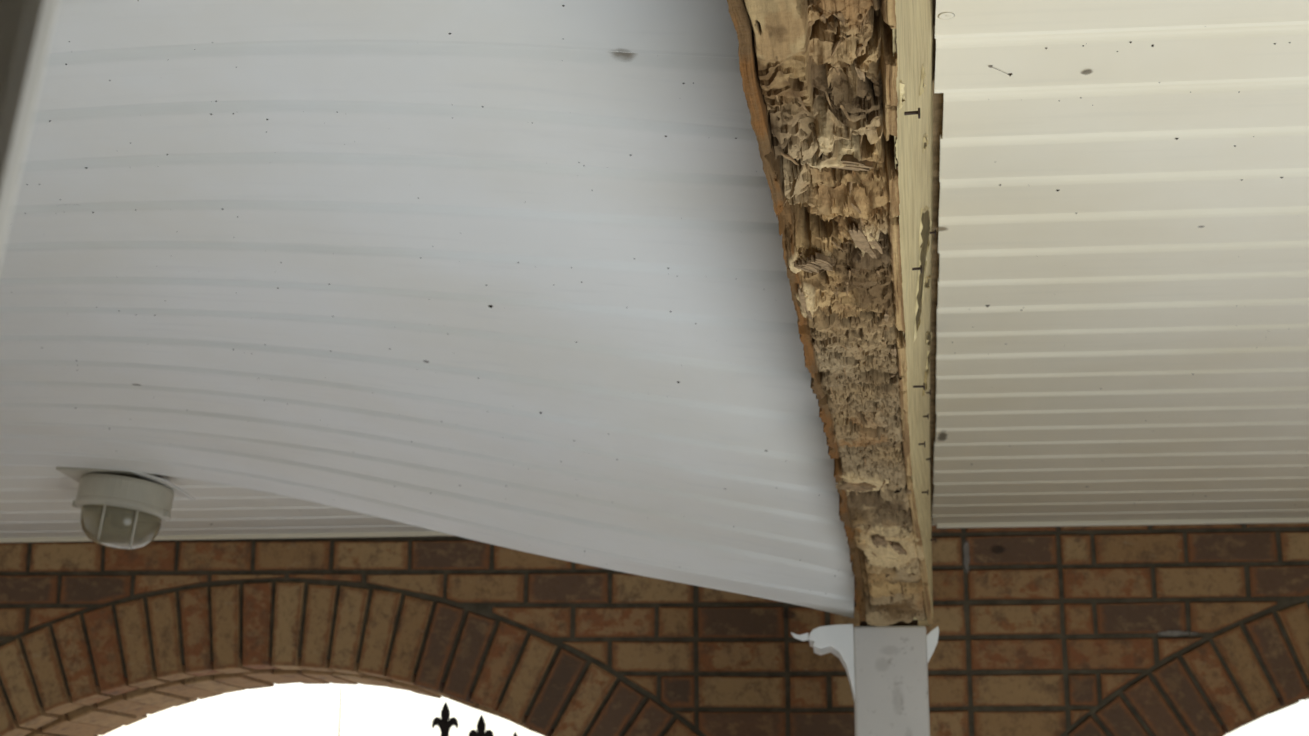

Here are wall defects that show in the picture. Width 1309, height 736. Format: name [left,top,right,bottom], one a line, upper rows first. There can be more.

peeling [899,64,926,110]
peeling [913,206,932,346]